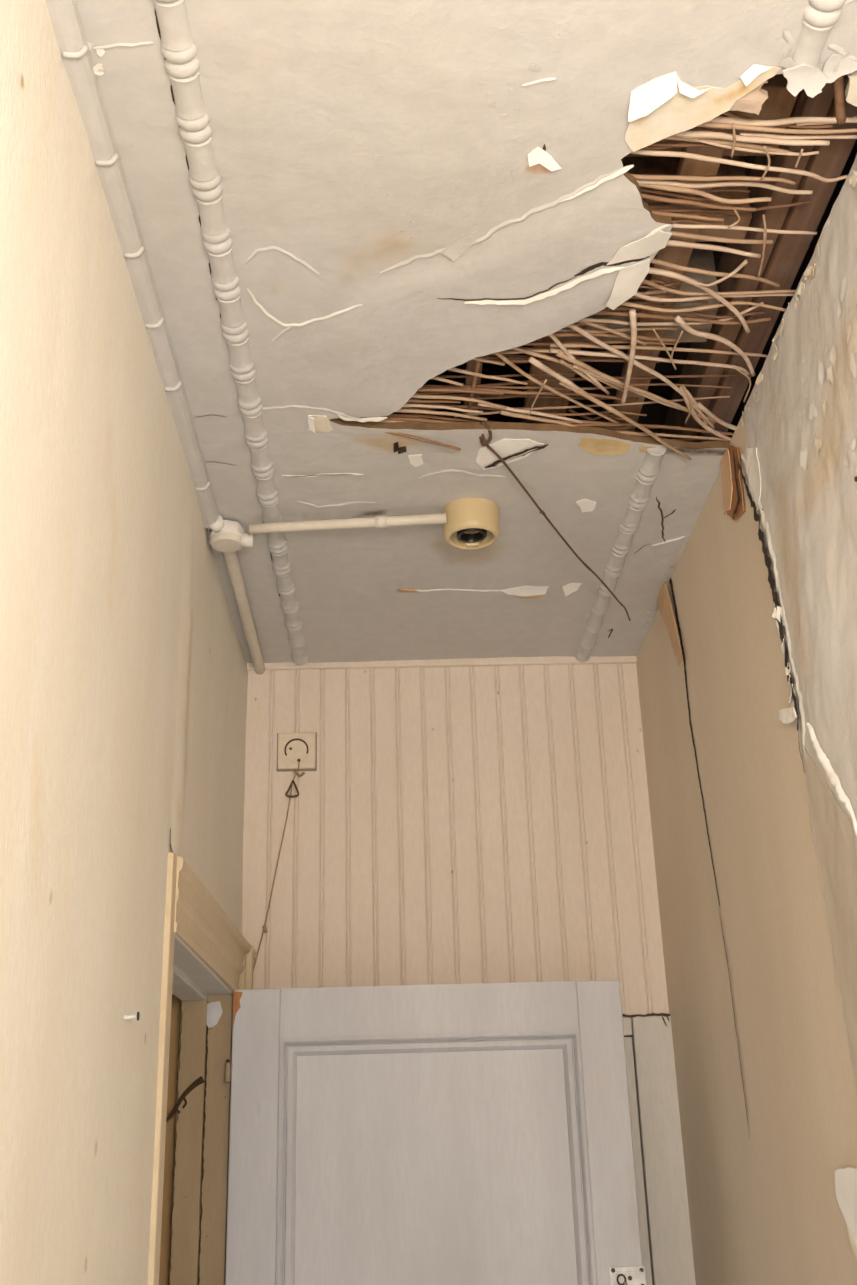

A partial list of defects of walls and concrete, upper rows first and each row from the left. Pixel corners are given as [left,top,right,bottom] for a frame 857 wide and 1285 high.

peeling [624,30,857,152]
peeling [527,144,562,171]
crack [437,225,672,310]
flaking render [772,245,819,361]
peeling [798,278,857,420]
flaking render [741,372,763,426]
peeling [394,442,423,467]
flaking render [476,438,549,470]
crack [634,497,685,554]
peeling [401,583,582,599]
crack [669,578,750,1136]
flaking render [805,749,857,1092]